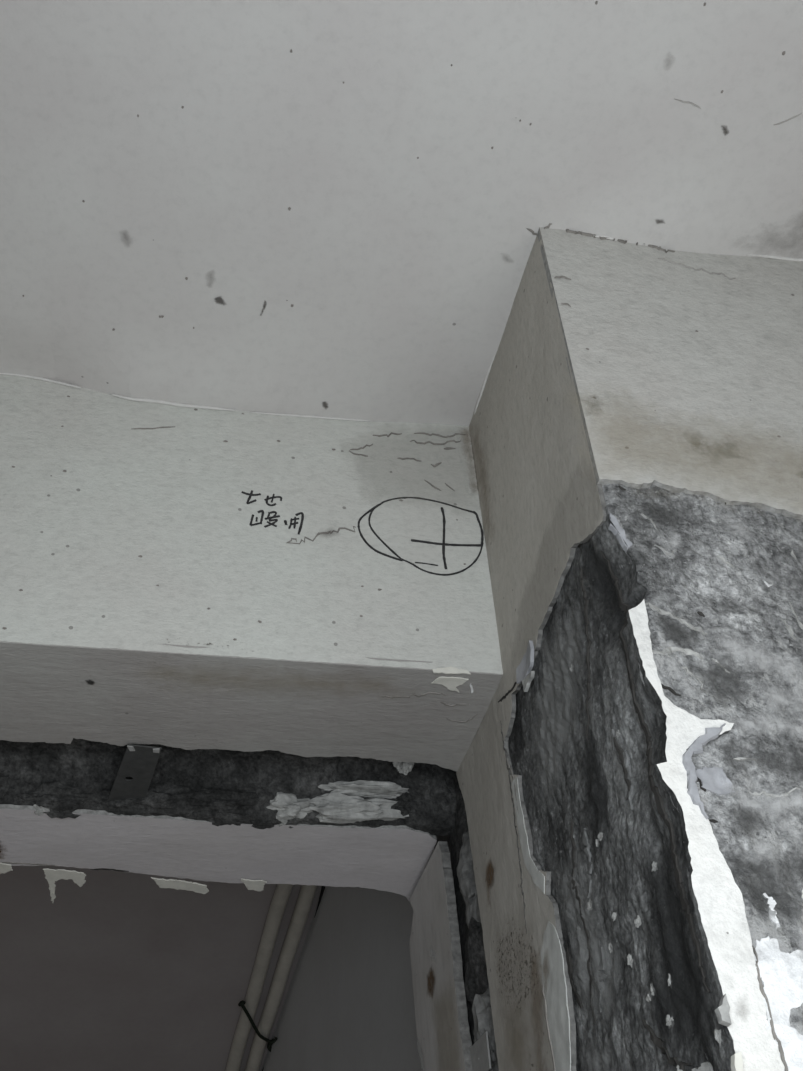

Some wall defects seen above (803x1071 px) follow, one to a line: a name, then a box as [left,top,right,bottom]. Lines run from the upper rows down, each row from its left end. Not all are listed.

crack [287,526,356,544]
peeling [431,666,473,693]
flaking render [508,483,803,1071]
peeling [43,868,86,903]
peeling [151,877,209,894]